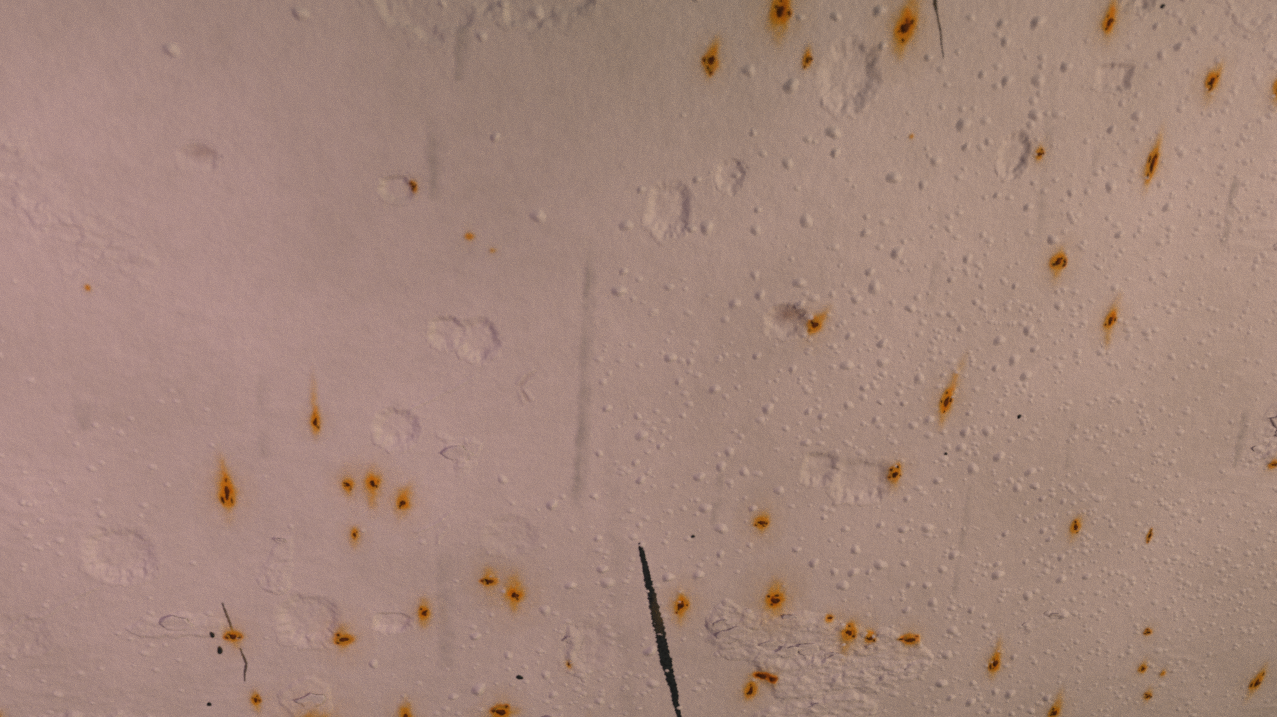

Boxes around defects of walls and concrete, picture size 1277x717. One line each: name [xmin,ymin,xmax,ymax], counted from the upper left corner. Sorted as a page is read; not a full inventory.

corrosion [770,0,793,25]
corrosion [894,1,917,46]
corrosion [1205,69,1220,92]
corrosion [1146,141,1160,183]
corrosion [1050,253,1068,274]
corrosion [940,374,957,415]
corrosion [219,466,235,508]
peeling [704,598,934,717]